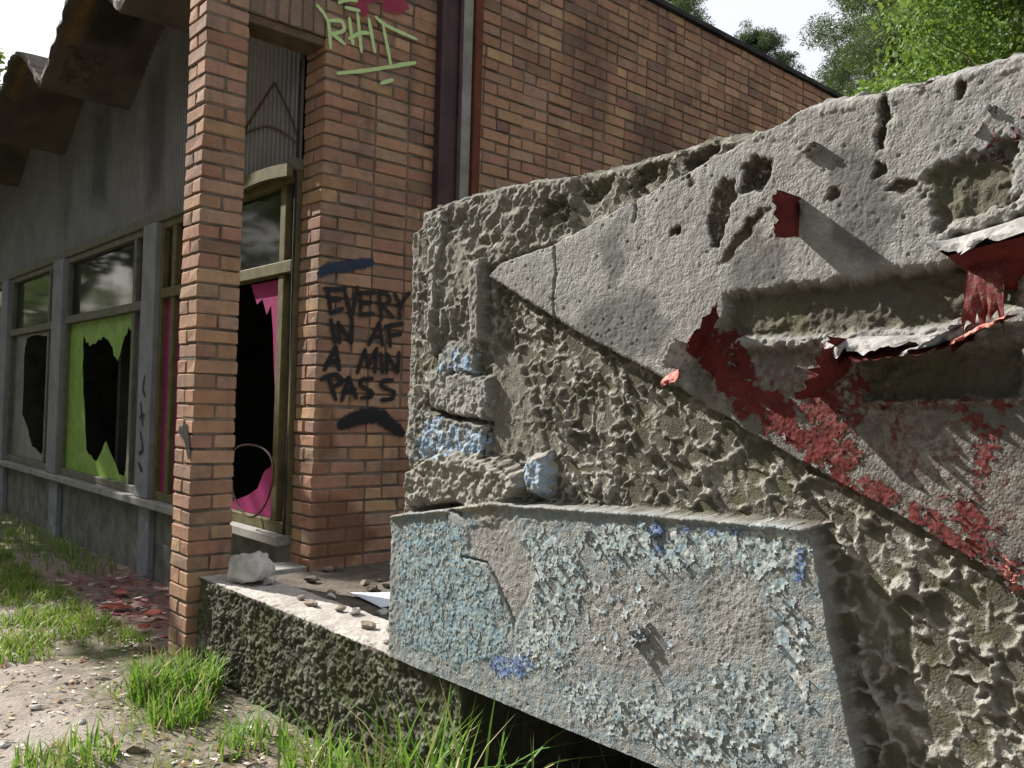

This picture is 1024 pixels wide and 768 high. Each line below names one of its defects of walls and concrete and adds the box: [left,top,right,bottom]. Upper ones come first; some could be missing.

peeling [708,154,803,265]
spalling [827,187,842,202]
crack [436,409,503,470]
peeling [654,215,1024,594]
peeling [395,512,813,768]